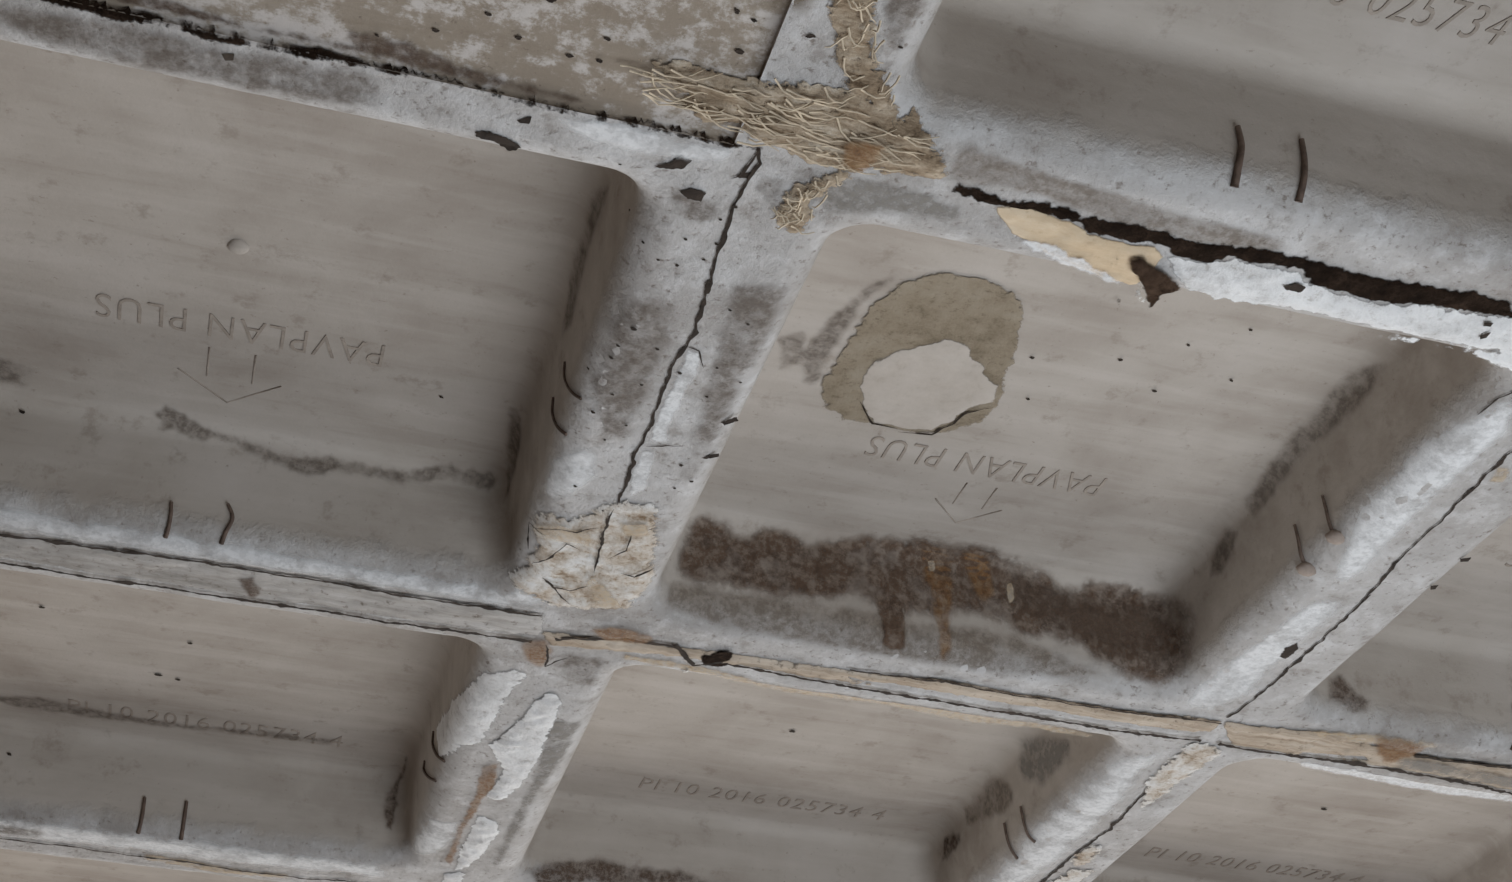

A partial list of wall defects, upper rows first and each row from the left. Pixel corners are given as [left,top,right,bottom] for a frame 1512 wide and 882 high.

spalling [656,156,692,169]
crack [618,148,762,503]
spalling [680,188,706,202]
peeling [820,273,1024,435]
peeling [997,207,1180,307]
damp [0,453,661,610]
damp [669,518,1186,682]
crack [1041,452,1512,882]